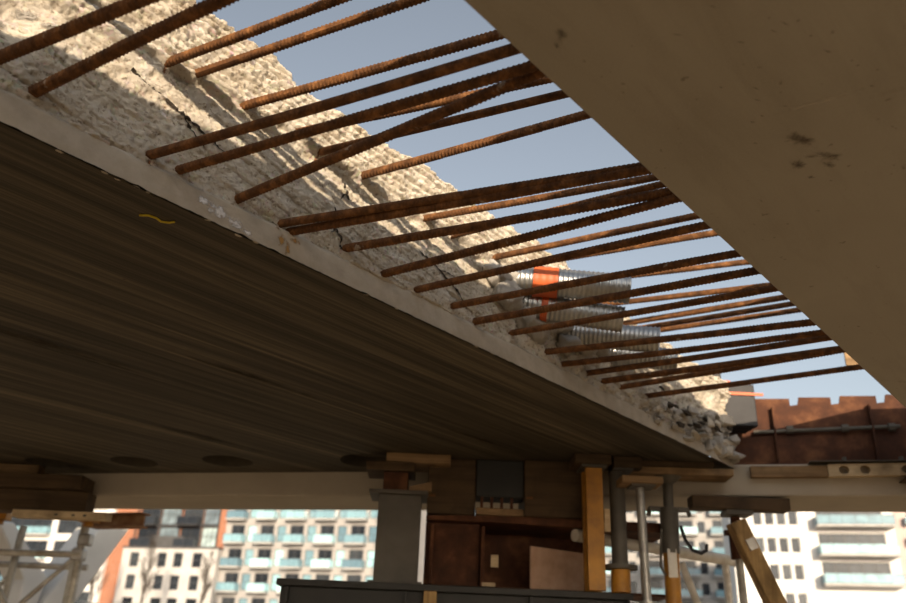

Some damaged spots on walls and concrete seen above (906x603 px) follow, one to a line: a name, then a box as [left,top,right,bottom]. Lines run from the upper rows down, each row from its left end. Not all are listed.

spalling [0,0,163,65]
spalling [28,0,239,98]
spalling [164,0,430,78]
crack [131,67,225,152]
spalling [145,30,591,204]
spalling [277,162,719,293]
spalling [450,250,864,464]